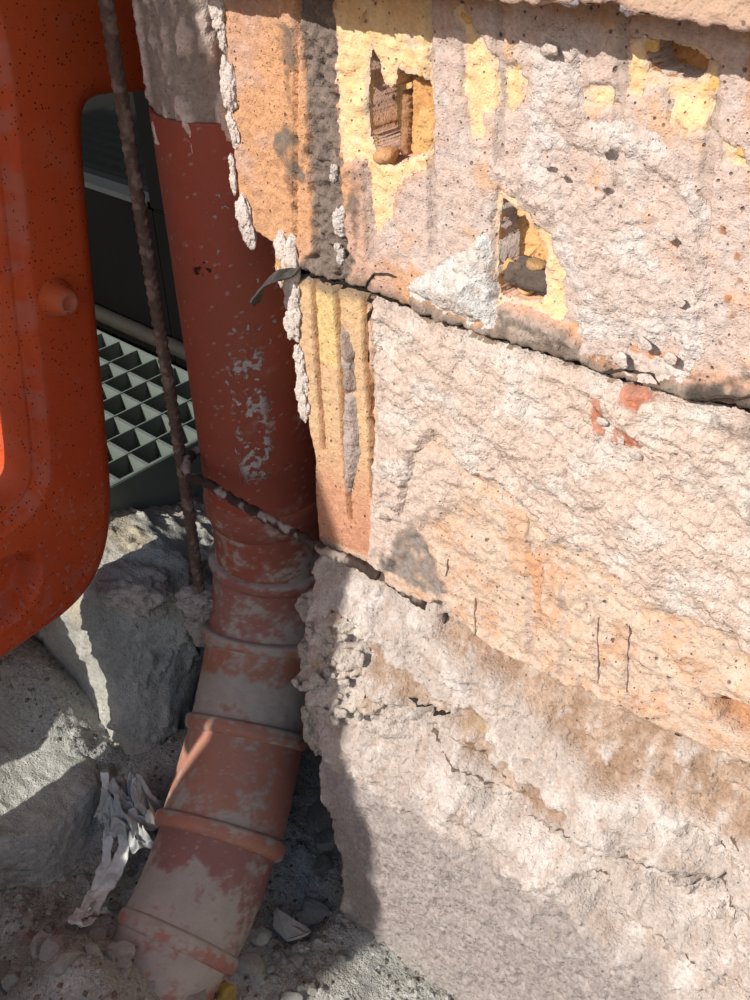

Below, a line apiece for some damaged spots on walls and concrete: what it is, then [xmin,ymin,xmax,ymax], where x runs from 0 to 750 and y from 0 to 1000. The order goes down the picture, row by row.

peeling [208,0,252,237]
spalling [330,0,434,232]
spalling [453,4,528,141]
spalling [583,35,721,133]
peeling [273,229,302,327]
peeling [332,205,346,258]
spalling [493,188,568,321]
peeling [292,344,310,414]
crack [301,269,750,413]
spalling [291,610,385,726]
crack [409,697,506,786]
crack [595,837,739,938]